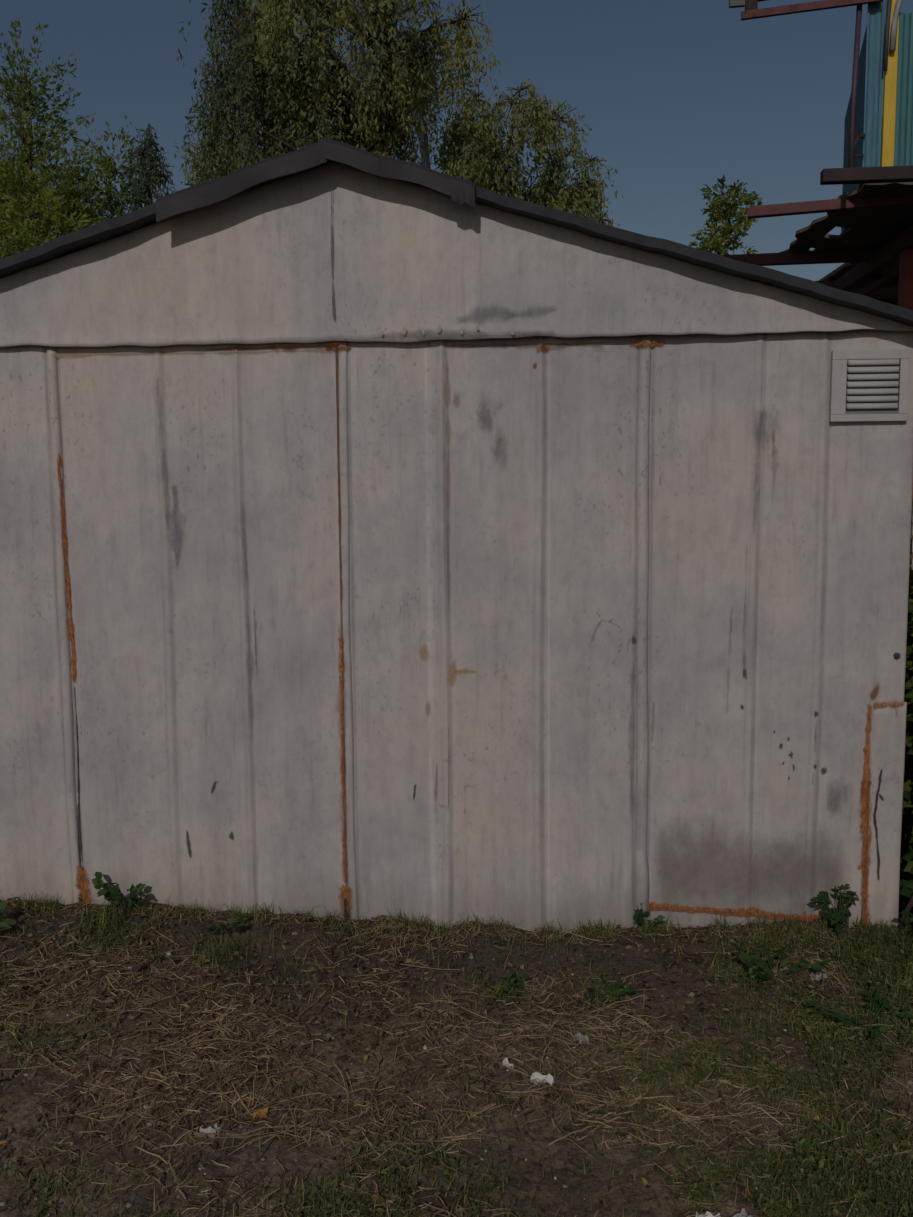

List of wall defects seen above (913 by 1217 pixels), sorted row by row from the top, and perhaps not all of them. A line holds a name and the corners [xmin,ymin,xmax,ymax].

corrosion [57,454,77,683]
corrosion [76,865,91,905]
corrosion [339,620,351,920]
corrosion [648,902,820,922]
corrosion [858,685,905,927]